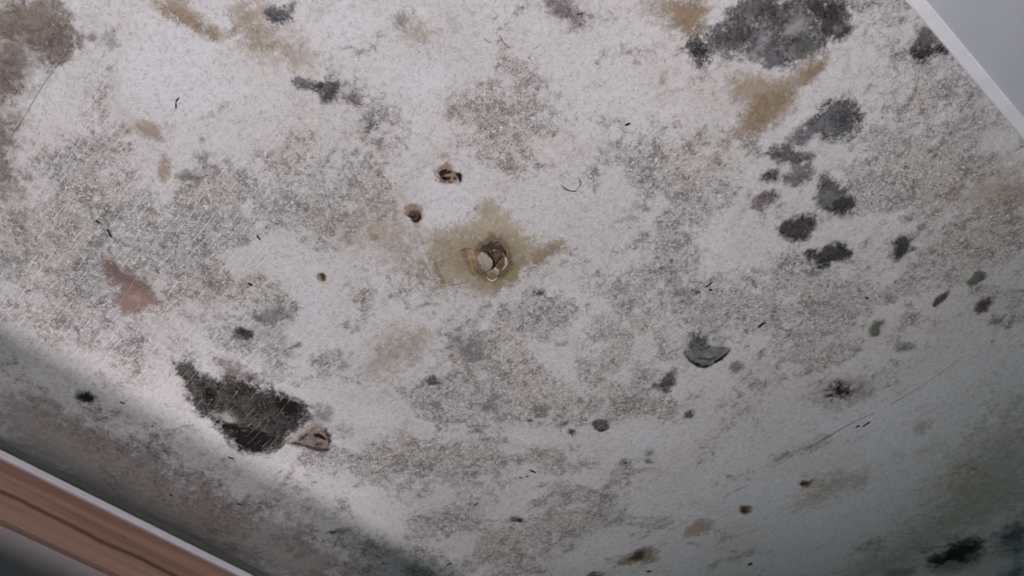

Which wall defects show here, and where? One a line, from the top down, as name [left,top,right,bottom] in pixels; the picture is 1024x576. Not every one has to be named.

mould [0,0,109,102]
leakage [648,0,853,135]
mould [910,27,948,64]
mould [752,99,863,276]
peeling [684,331,730,368]
mould [828,380,851,398]
leakage [923,524,1024,576]